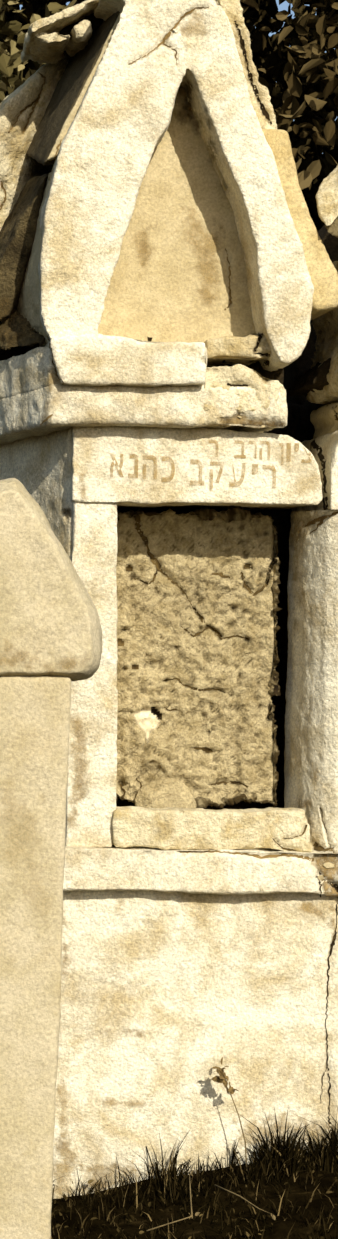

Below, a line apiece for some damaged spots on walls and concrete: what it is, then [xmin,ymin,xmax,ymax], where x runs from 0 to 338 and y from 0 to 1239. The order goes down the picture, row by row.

crack [129,7,272,124]
crack [132,515,249,640]
crack [212,572,269,596]
crack [164,678,230,711]
crack [181,808,338,1137]